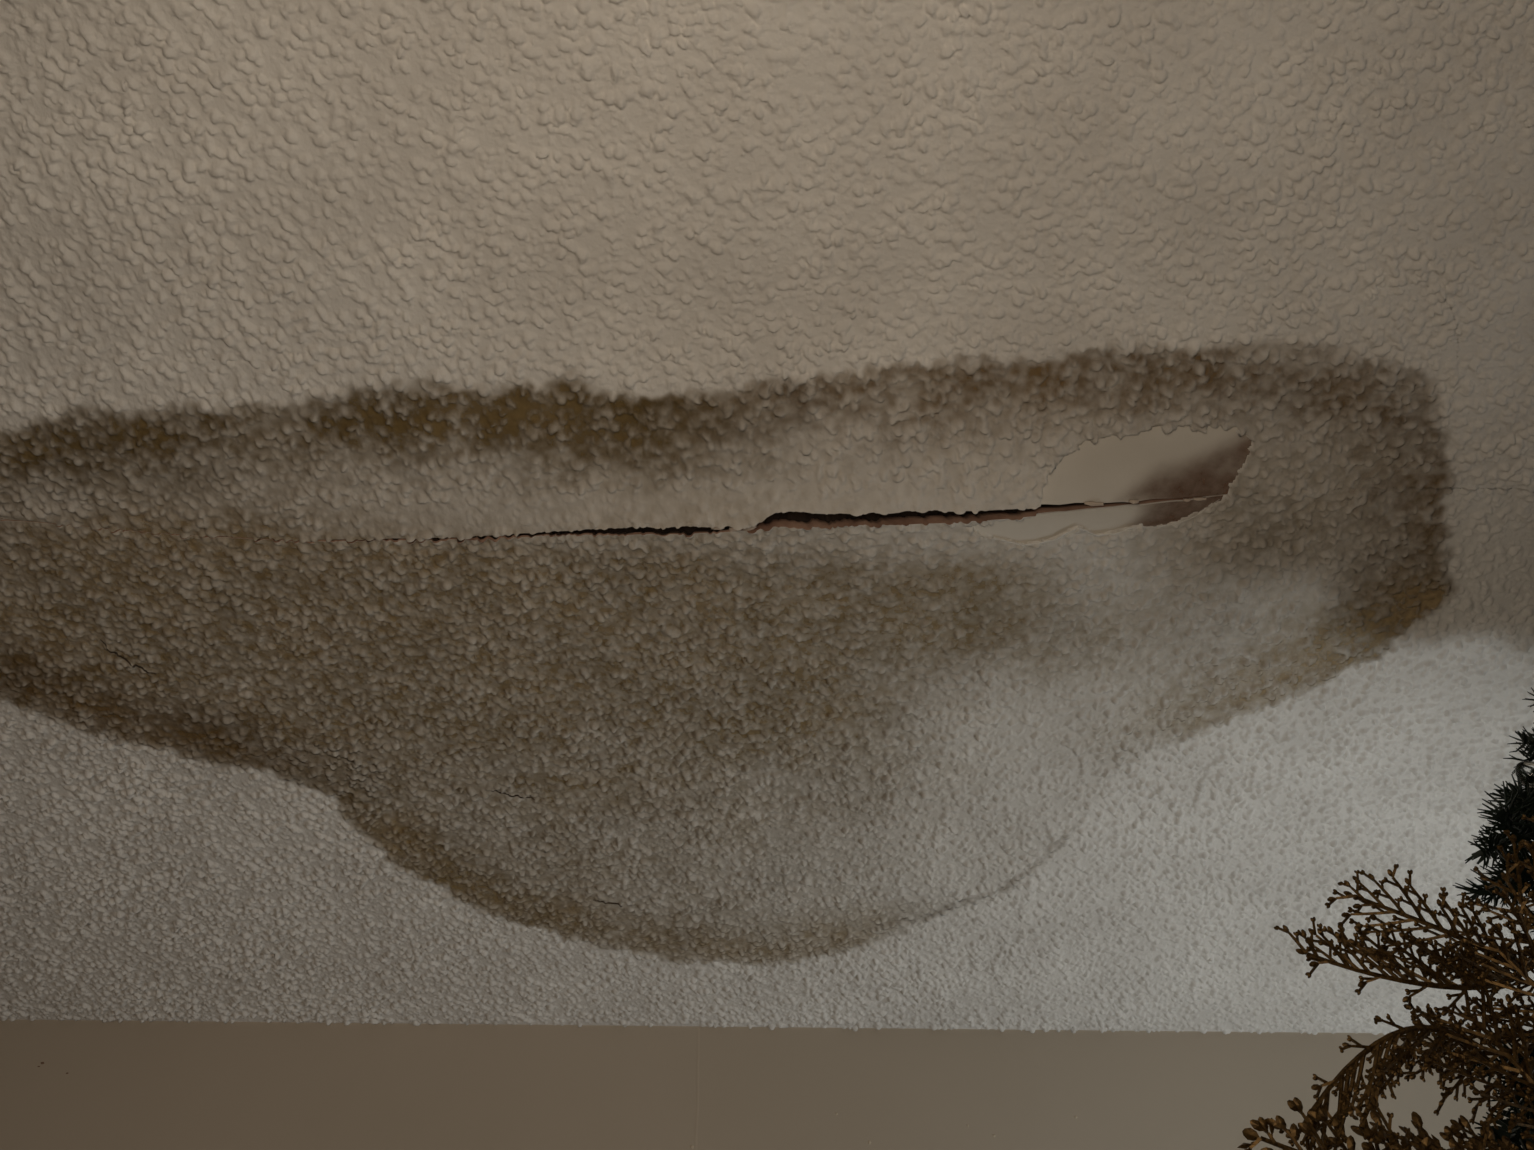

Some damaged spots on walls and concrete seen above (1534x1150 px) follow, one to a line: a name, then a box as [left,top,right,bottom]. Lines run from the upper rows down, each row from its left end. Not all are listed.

damp [0,383,734,483]
damp [921,351,1275,413]
damp [1278,368,1404,425]
crack [0,494,1228,544]
peeling [966,425,1252,546]
damp [1188,583,1445,726]
damp [0,509,1055,938]